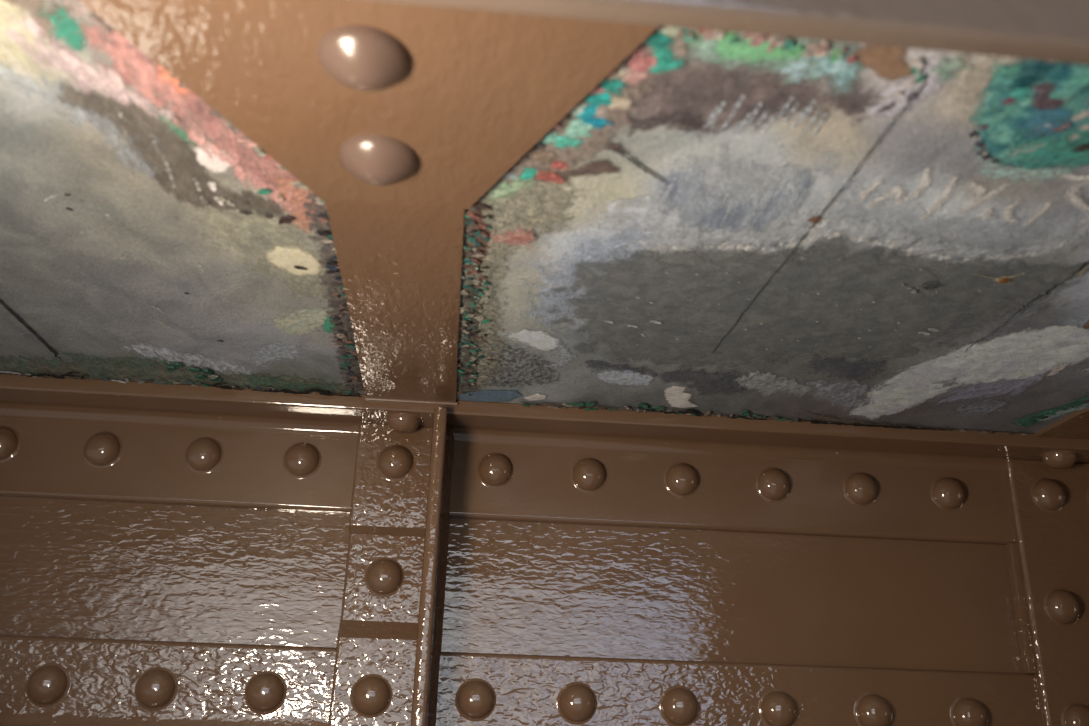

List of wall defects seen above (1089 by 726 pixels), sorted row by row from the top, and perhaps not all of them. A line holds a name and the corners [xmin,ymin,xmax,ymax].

crack [966,262,1089,352]